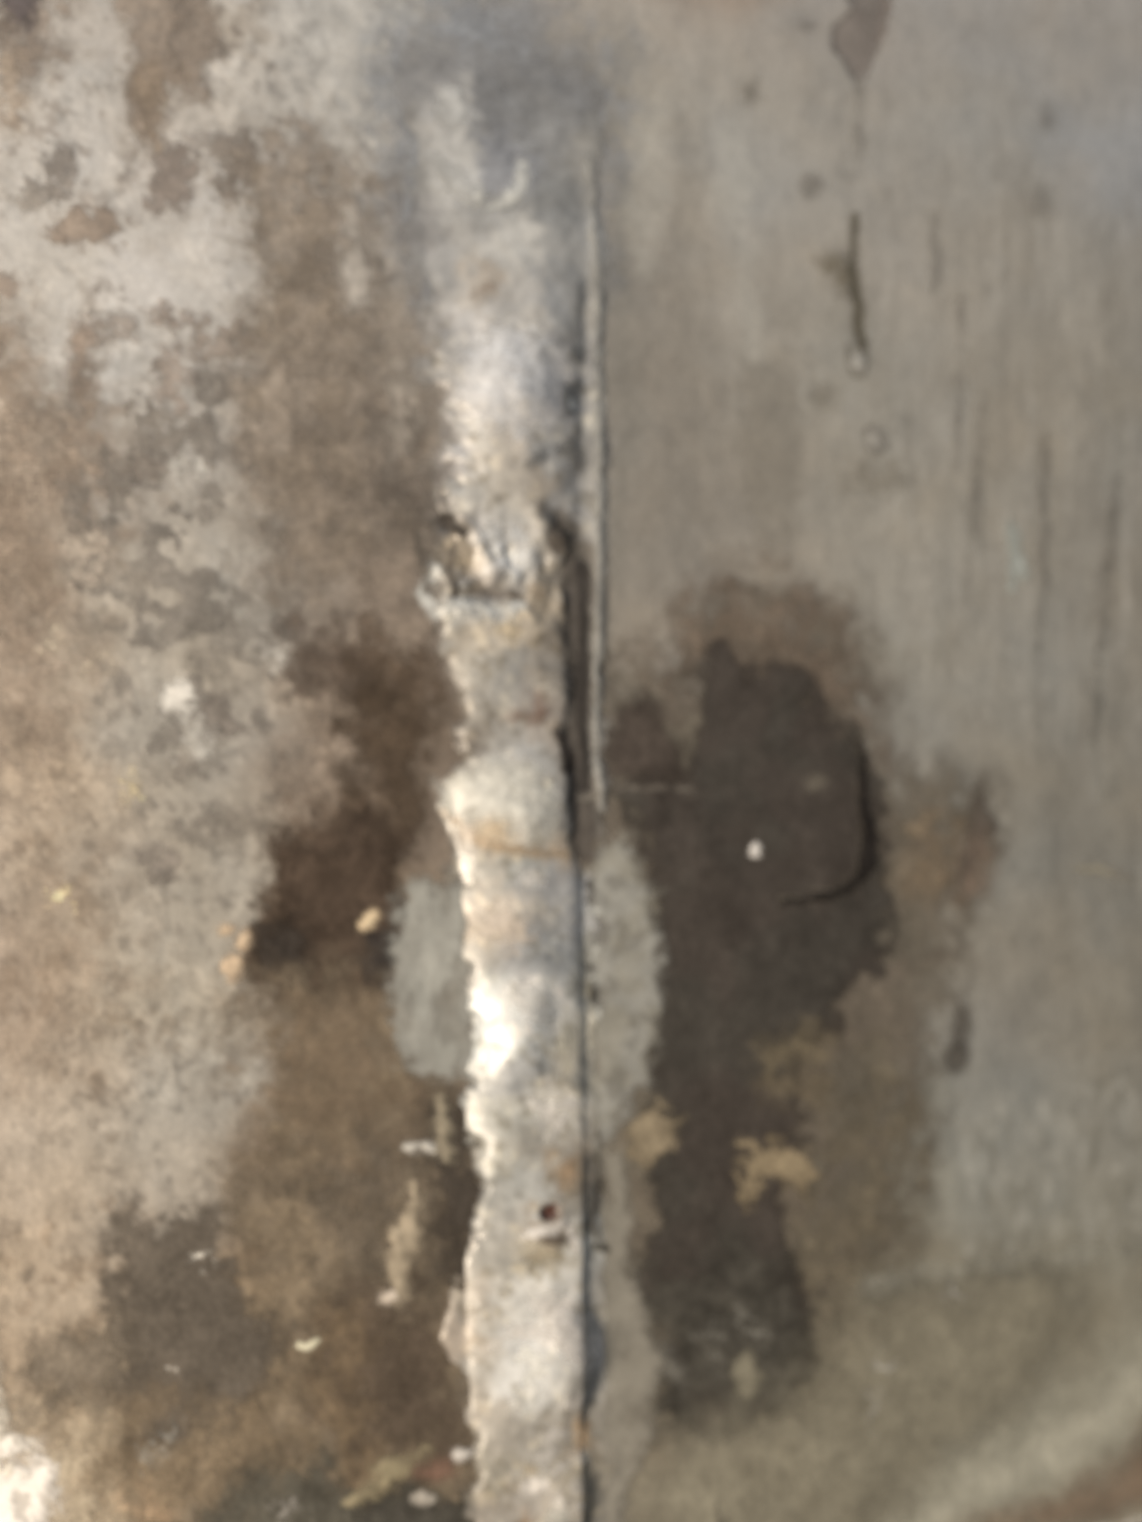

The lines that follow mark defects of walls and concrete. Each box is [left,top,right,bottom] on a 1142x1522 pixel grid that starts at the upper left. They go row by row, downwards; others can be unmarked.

damp [0,0,70,124]
damp [115,0,220,154]
damp [824,214,868,377]
damp [0,357,107,759]
crack [780,739,877,905]